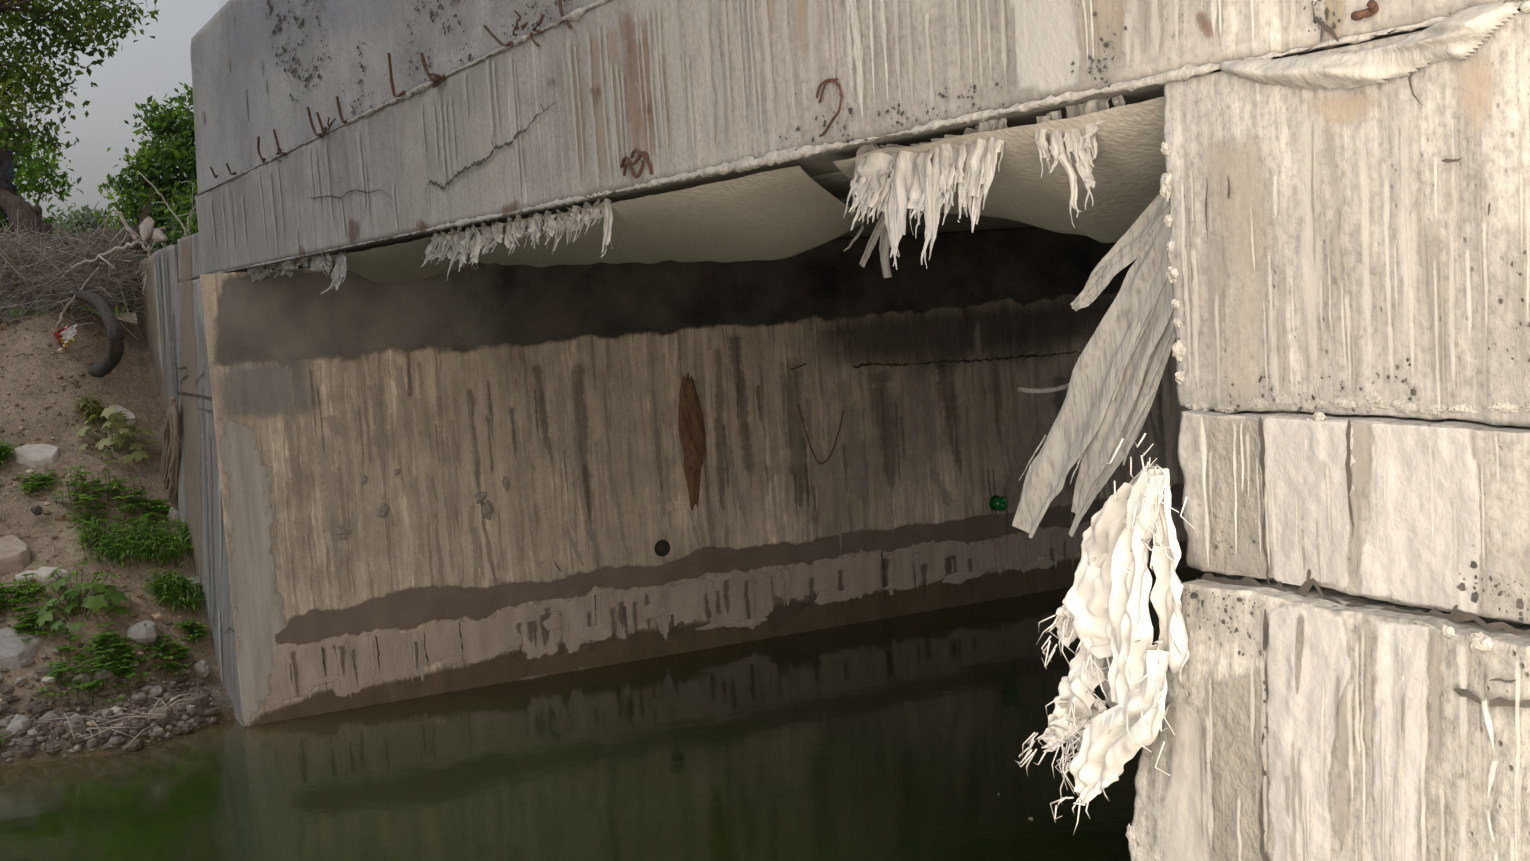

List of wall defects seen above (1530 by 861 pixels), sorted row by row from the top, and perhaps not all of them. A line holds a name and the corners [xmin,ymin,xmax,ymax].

water stain [226,0,382,71]
crack [311,102,555,203]
water stain [154,228,1137,726]